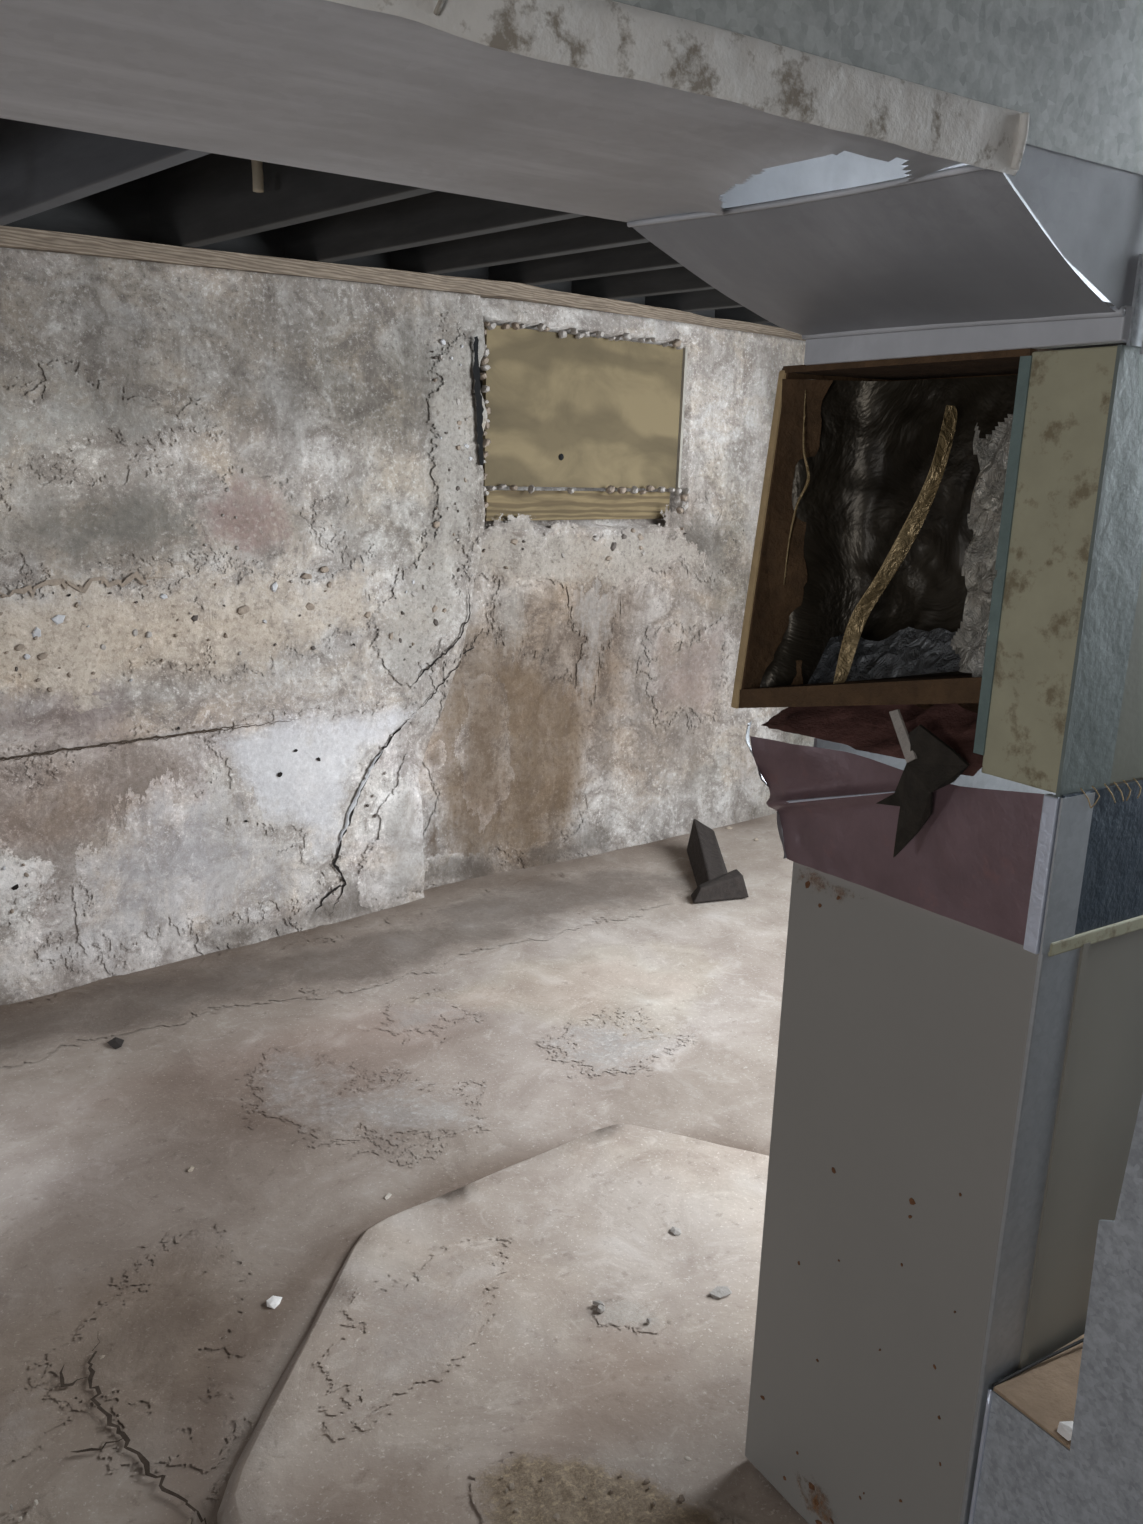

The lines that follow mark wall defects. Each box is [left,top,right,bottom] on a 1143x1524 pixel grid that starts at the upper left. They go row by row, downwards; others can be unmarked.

crack [0,717,310,761]
crack [316,589,478,913]
crack [60,1337,207,1524]
spalling [468,1448,748,1524]